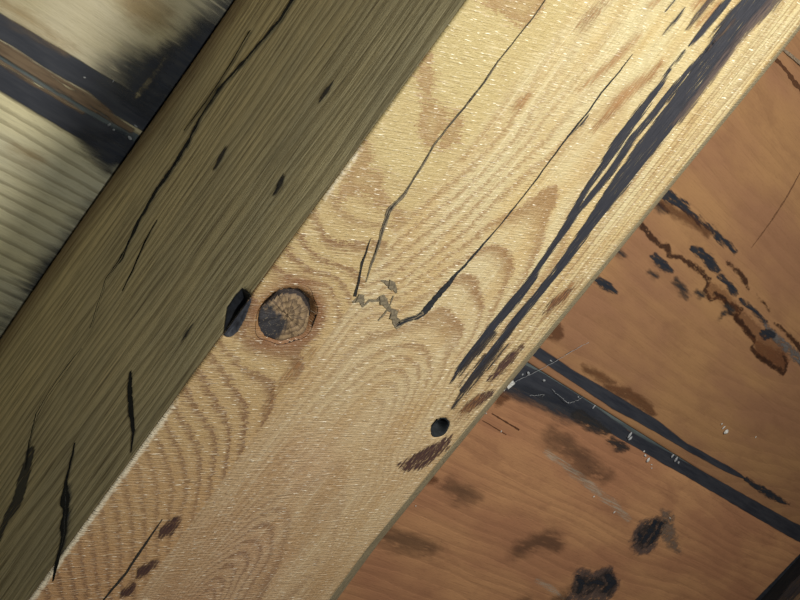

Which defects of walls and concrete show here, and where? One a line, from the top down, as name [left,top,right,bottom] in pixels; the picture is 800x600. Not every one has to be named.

damp [0,0,235,174]
crack [775,58,800,90]
crack [353,0,633,329]
crack [751,173,800,248]
damp [450,0,800,542]
damp [397,434,453,472]
damp [755,554,800,600]